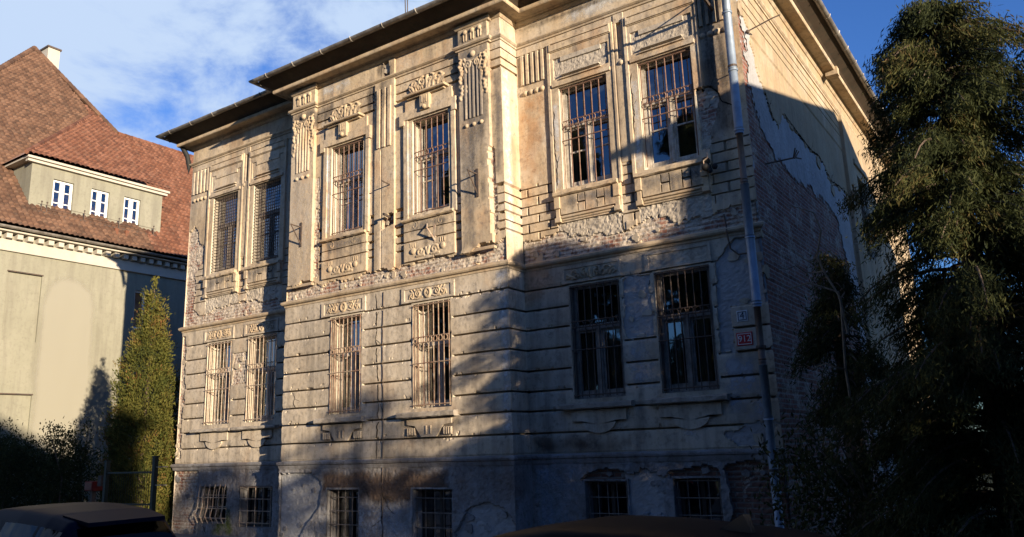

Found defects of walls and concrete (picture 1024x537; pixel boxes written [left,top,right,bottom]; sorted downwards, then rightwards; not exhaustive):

flaking render [172,147,516,537]
flaking render [524,0,887,537]